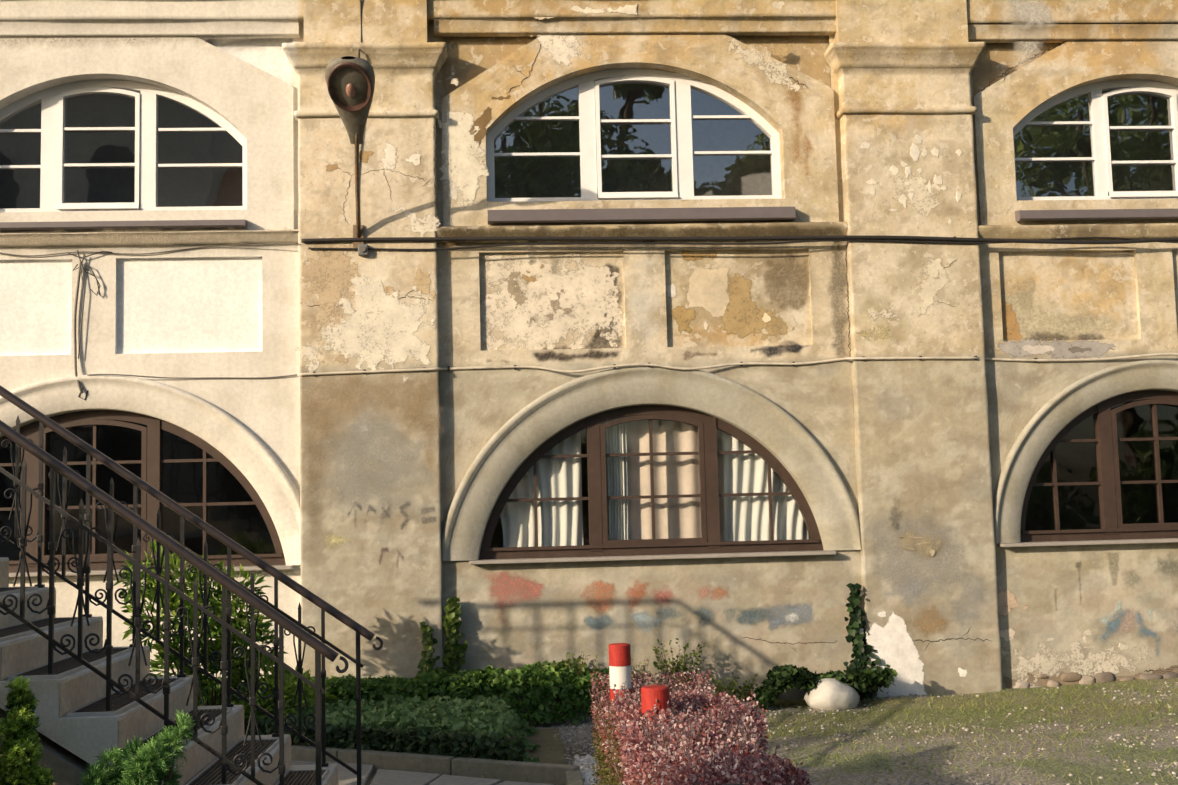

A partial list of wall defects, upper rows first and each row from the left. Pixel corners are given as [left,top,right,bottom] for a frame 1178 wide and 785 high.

peeling [728,42,806,92]
crack [326,125,438,237]
peeling [354,139,421,170]
peeling [393,207,440,237]
flaking render [435,95,511,207]
peeling [866,135,961,216]
peeling [296,245,436,381]
peeling [481,252,625,350]
flaking render [666,251,797,339]
flaking render [998,300,1116,359]
peeling [859,611,927,698]